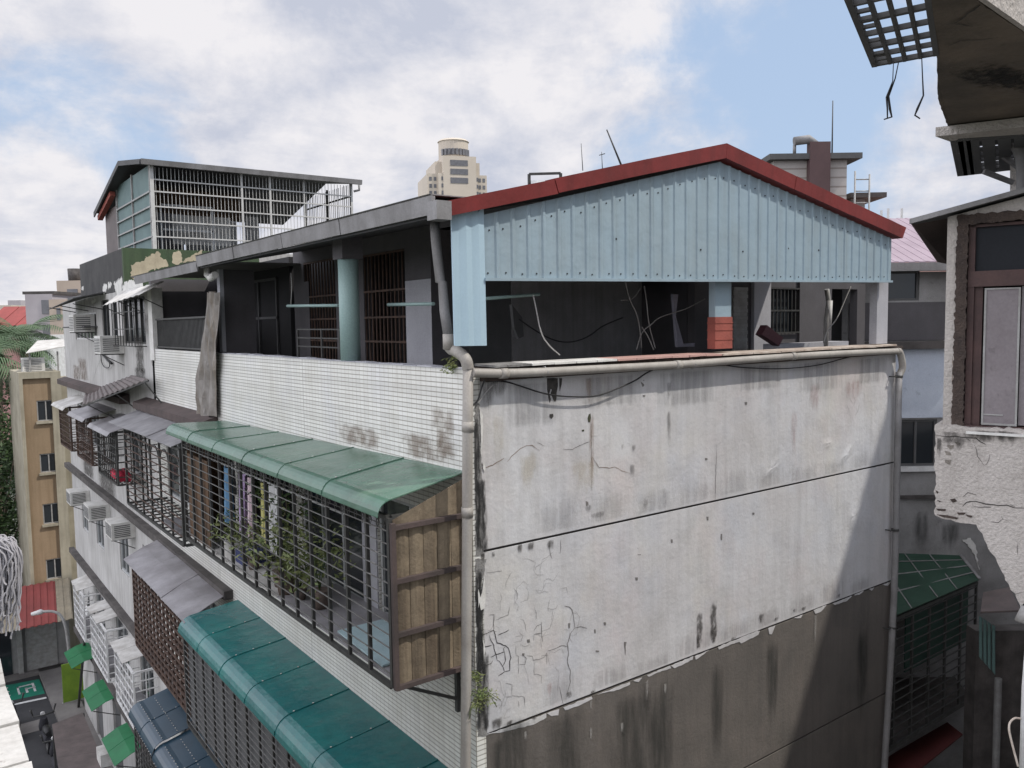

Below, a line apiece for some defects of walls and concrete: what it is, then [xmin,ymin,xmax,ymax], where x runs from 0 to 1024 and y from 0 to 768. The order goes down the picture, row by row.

peeling [81,250,202,305]
crack [481,430,628,491]
crack [938,435,990,465]
flaking render [936,491,972,519]
crack [963,492,1015,523]
peeling [474,401,775,737]
peeling [963,538,980,570]
crack [473,540,585,719]
leakage [697,605,717,648]